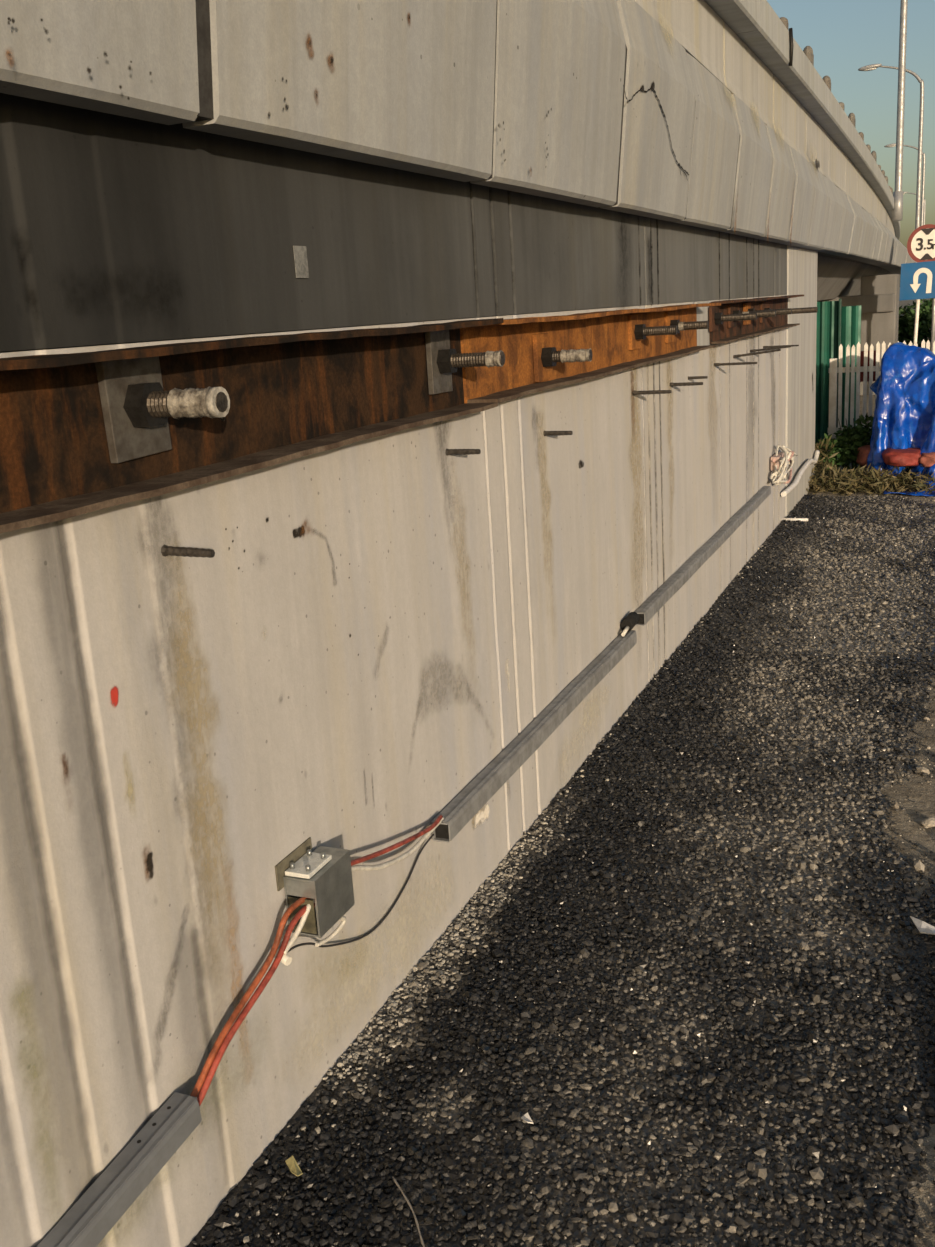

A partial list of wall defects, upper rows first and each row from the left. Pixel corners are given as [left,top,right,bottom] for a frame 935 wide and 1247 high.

crack [623,85,689,181]